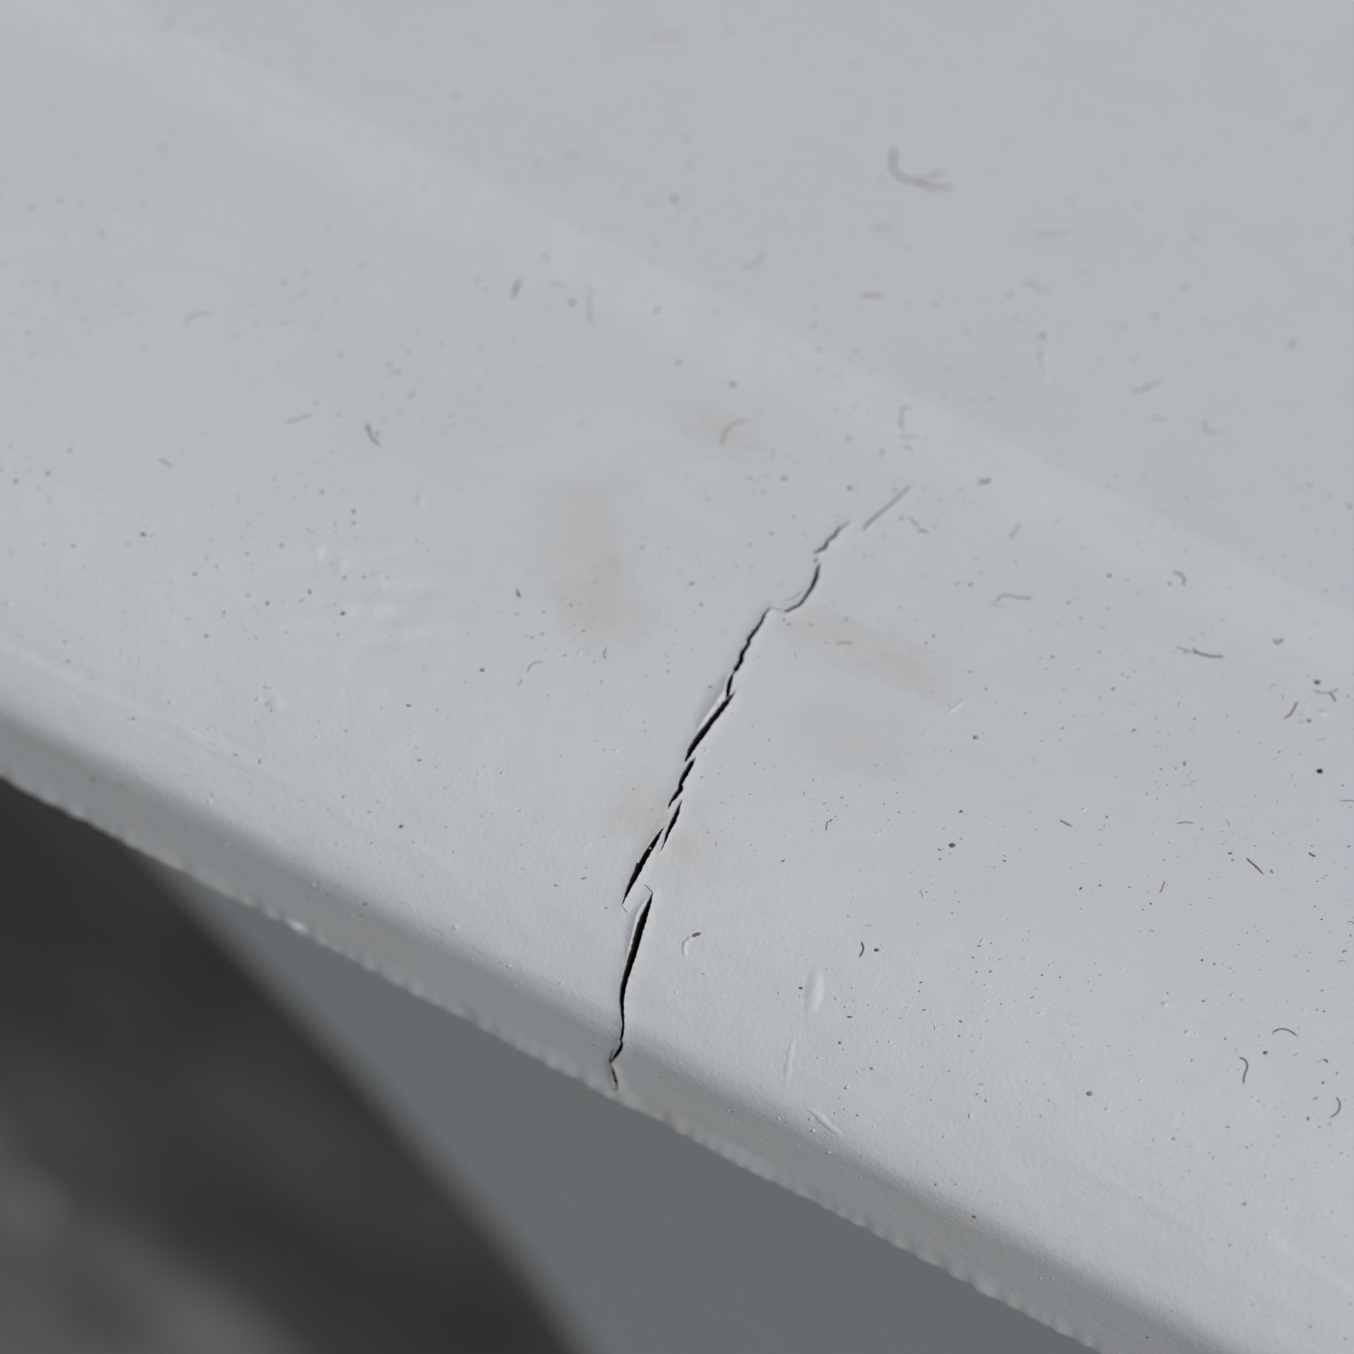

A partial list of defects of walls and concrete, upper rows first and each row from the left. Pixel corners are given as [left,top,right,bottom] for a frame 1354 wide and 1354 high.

crack [609,485,911,1090]